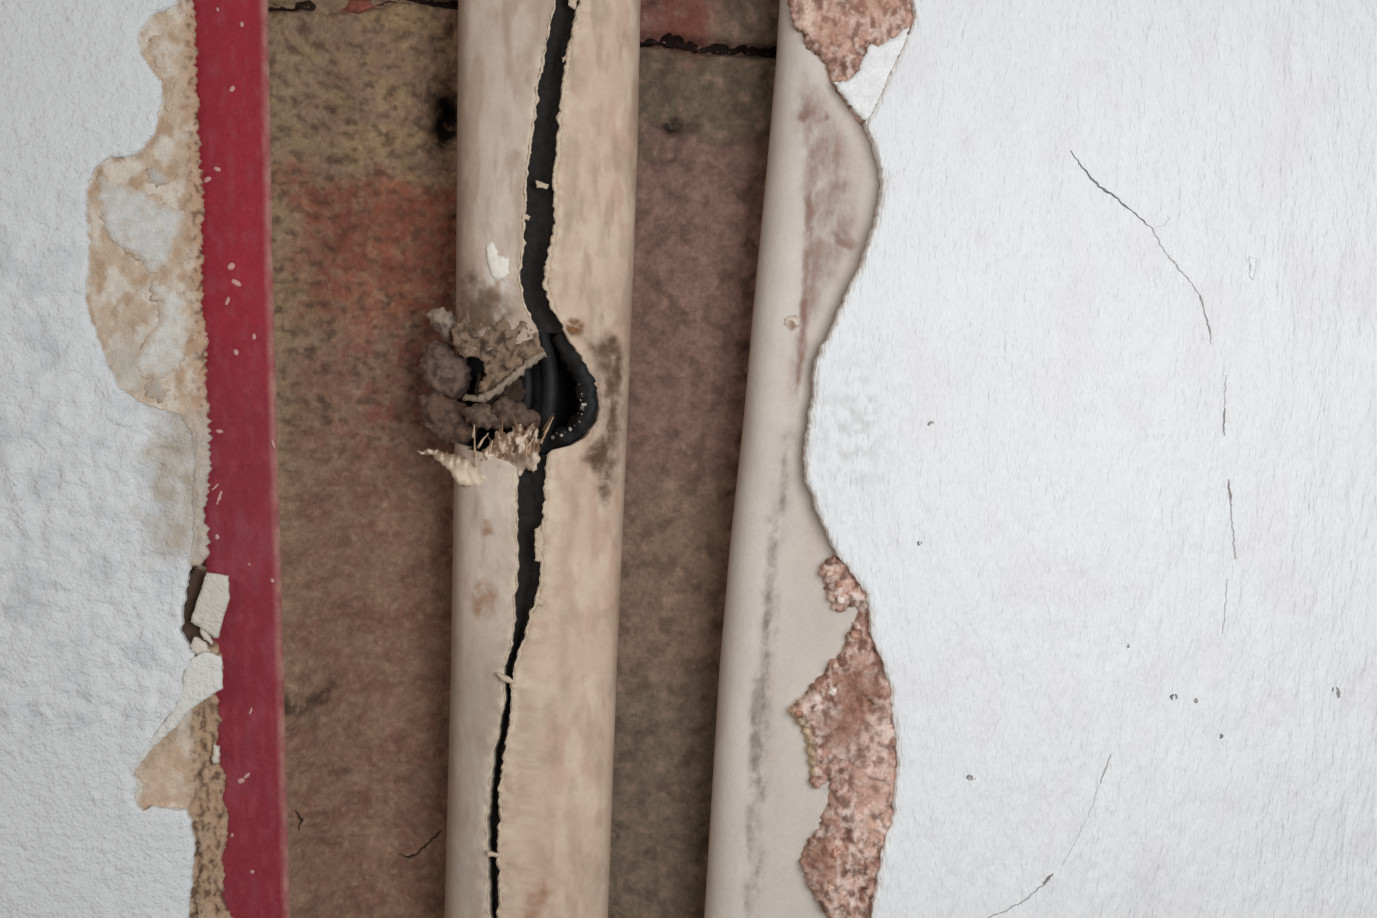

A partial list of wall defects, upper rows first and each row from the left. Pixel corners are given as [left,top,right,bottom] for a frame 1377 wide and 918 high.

flaking render [788,0,914,124]
peeling [485,242,510,280]
crack [1070,150,1212,344]
peeling [86,0,250,918]
crack [1221,377,1229,436]
crack [1222,481,1236,634]
flaking render [788,555,897,918]